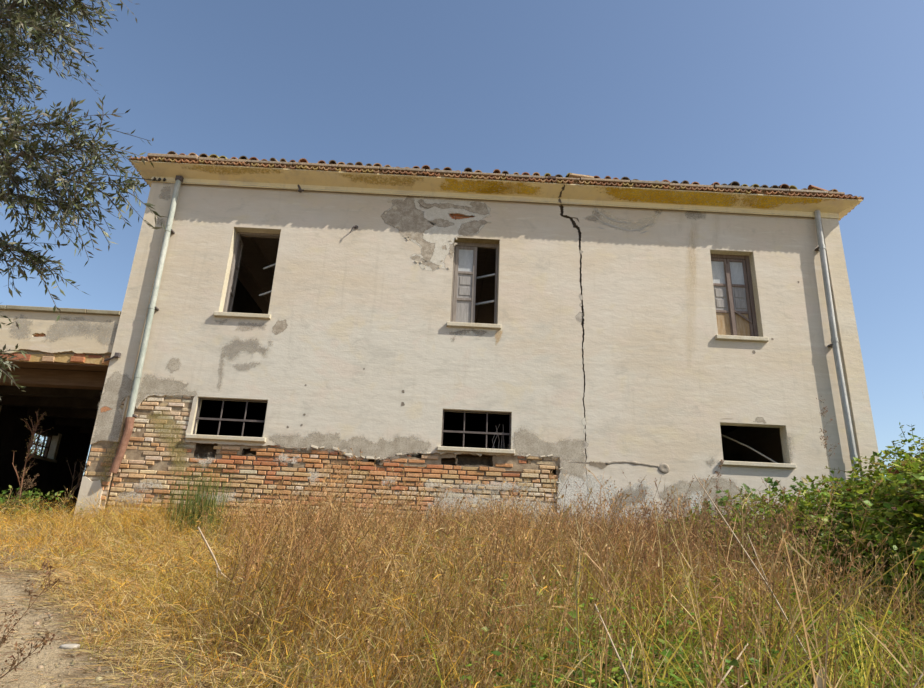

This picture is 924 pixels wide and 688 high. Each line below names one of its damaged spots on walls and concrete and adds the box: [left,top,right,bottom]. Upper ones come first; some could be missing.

peeling [381,196,492,271]
peeling [11,315,118,344]
peeling [273,320,287,335]
crack [558,185,590,494]
flaking render [84,372,659,531]